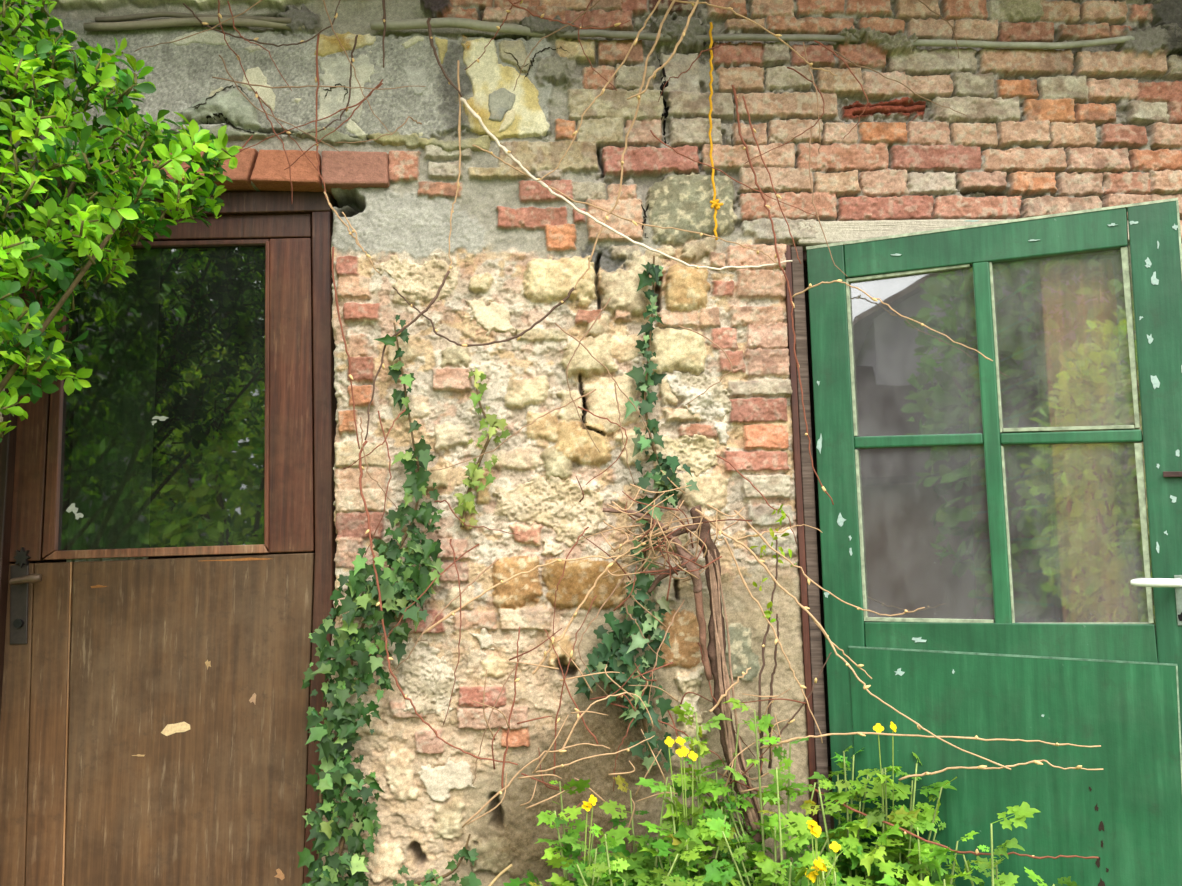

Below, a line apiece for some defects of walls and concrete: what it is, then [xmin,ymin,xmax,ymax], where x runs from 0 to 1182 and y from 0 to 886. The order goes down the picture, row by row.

peeling [169,30,231,46]
peeling [314,31,376,141]
peeling [399,36,550,141]
crack [657,54,669,144]
spalling [374,255,459,310]
spalling [465,297,516,336]
crack [581,382,602,433]
spalling [647,371,731,497]
spalling [492,474,609,556]
spalling [384,638,459,716]
spalling [674,666,708,751]
spalling [418,757,476,802]